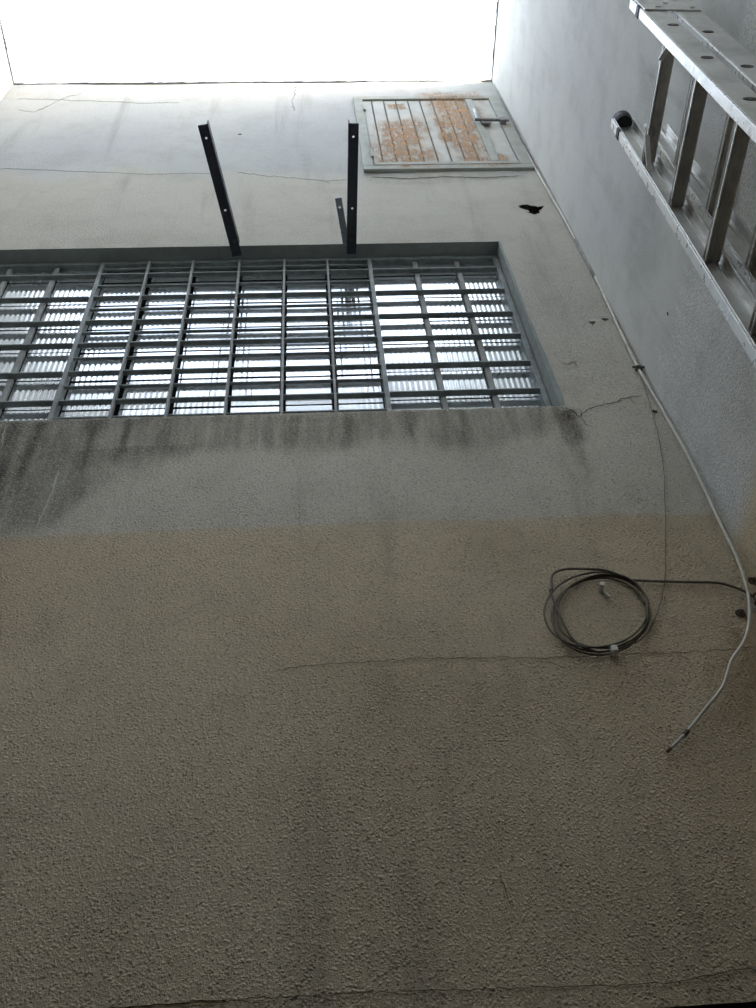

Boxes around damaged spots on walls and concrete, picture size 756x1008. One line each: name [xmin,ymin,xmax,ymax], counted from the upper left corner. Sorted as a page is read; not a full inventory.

rust [381,120,433,166]
rust [423,93,507,161]
crack [561,396,637,427]
crack [278,647,755,670]
crack [110,967,753,1008]